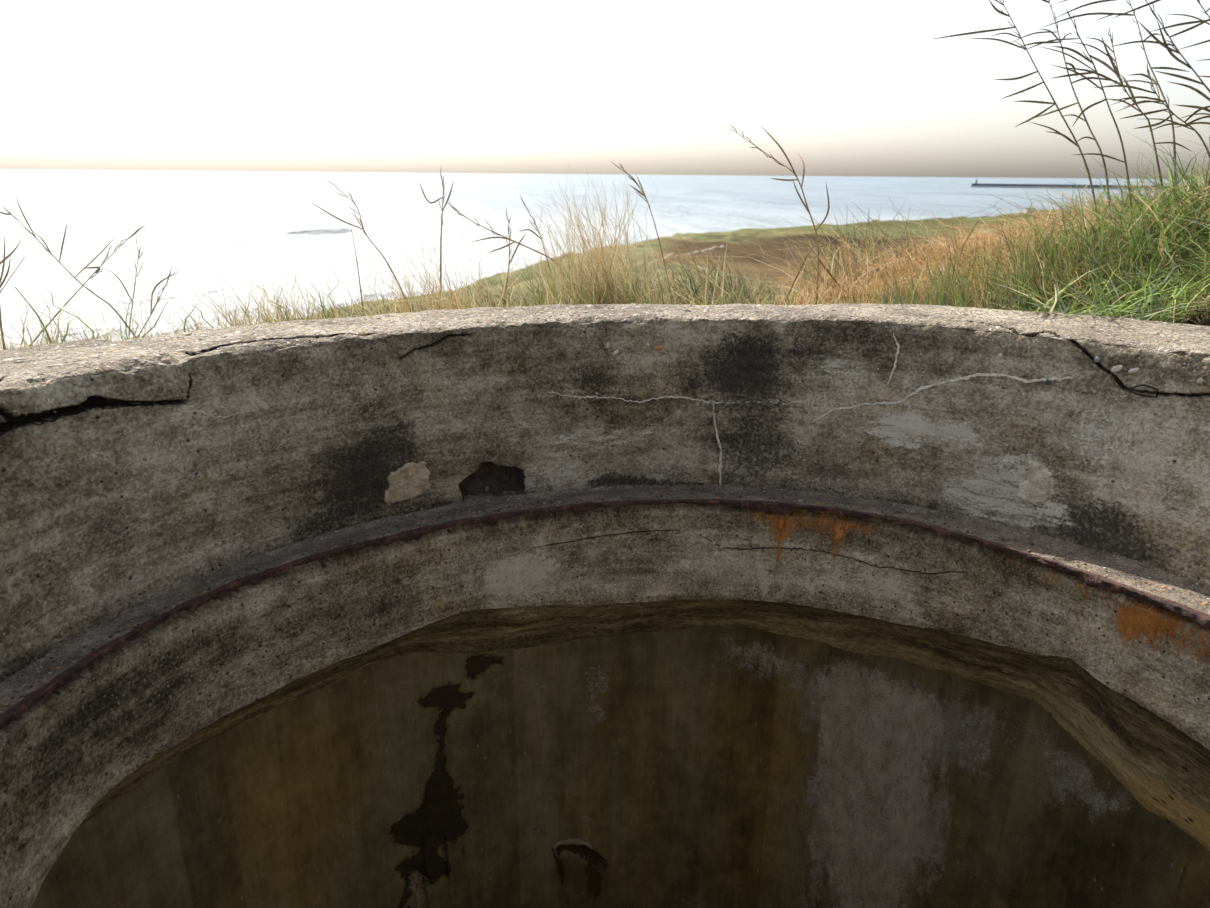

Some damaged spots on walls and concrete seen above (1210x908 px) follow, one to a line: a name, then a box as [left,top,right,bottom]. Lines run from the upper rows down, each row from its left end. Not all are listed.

crack [0,333,372,437]
crack [399,334,469,359]
spalling [385,402,525,504]
damp [701,329,806,480]
crack [548,320,1210,485]
peeling [1011,421,1066,509]
corrosion [749,508,884,561]
corrosion [1105,592,1210,660]
damp [389,654,504,907]
damp [723,637,1005,908]
spalling [552,838,608,870]